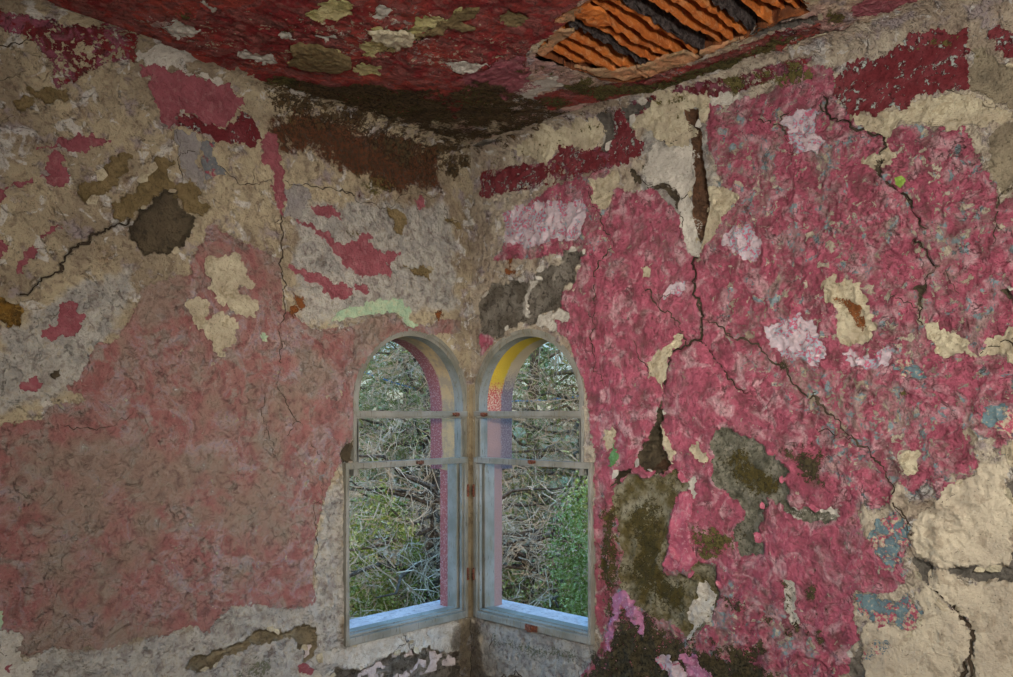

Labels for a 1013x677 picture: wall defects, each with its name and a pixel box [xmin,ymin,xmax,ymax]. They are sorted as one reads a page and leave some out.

crack [20,218,131,295]
flaking render [0,19,434,328]
water stain [268,107,443,200]
flaking render [445,47,762,339]
crack [820,95,958,325]
peeling [833,25,1013,195]
crack [634,179,955,542]
water stain [450,496,781,677]
mould [778,442,831,488]
water stain [781,580,828,647]
peeling [848,403,1013,677]
crack [927,584,976,677]